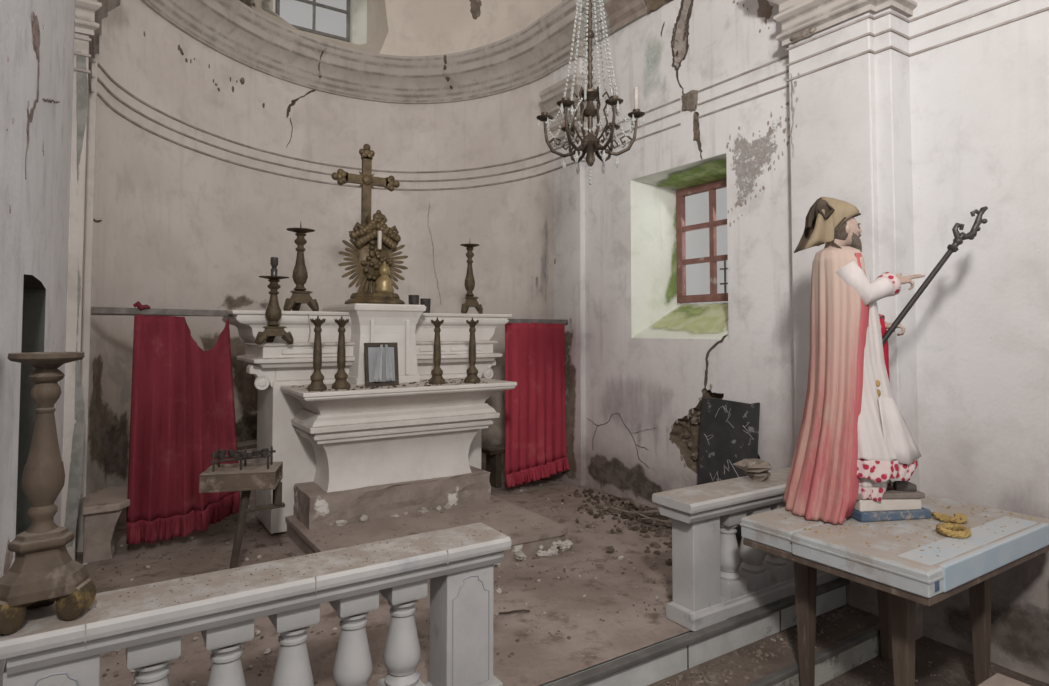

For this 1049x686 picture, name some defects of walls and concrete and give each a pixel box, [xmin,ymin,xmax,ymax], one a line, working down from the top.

flaking render [30,11,44,59]
flaking render [469,0,482,20]
flaking render [733,0,776,33]
crack [286,49,326,148]
peeling [726,73,800,227]
crack [704,334,728,388]
leakage [101,414,129,479]
leakage [562,319,662,503]
crack [587,413,655,468]
flaking render [669,384,724,474]